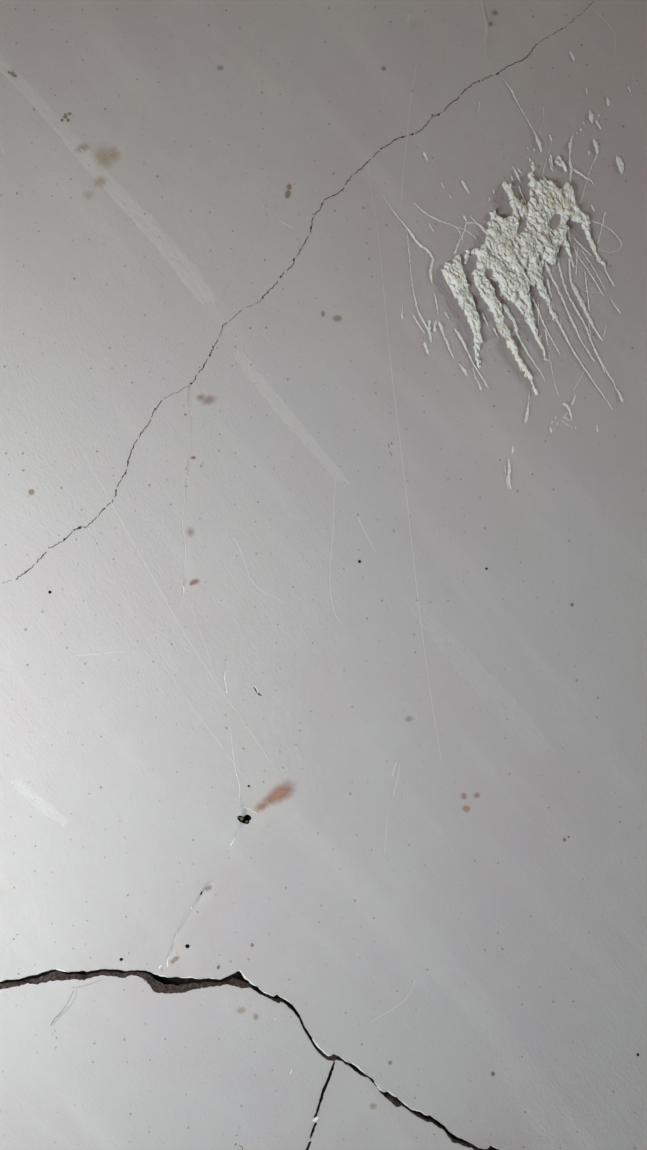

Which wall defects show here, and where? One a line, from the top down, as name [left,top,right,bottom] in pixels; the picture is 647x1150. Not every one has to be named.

damp [501,77,553,177]
damp [568,135,599,203]
crack [6,1,594,583]
damp [379,191,489,391]
damp [502,212,624,429]
crack [0,969,499,1150]